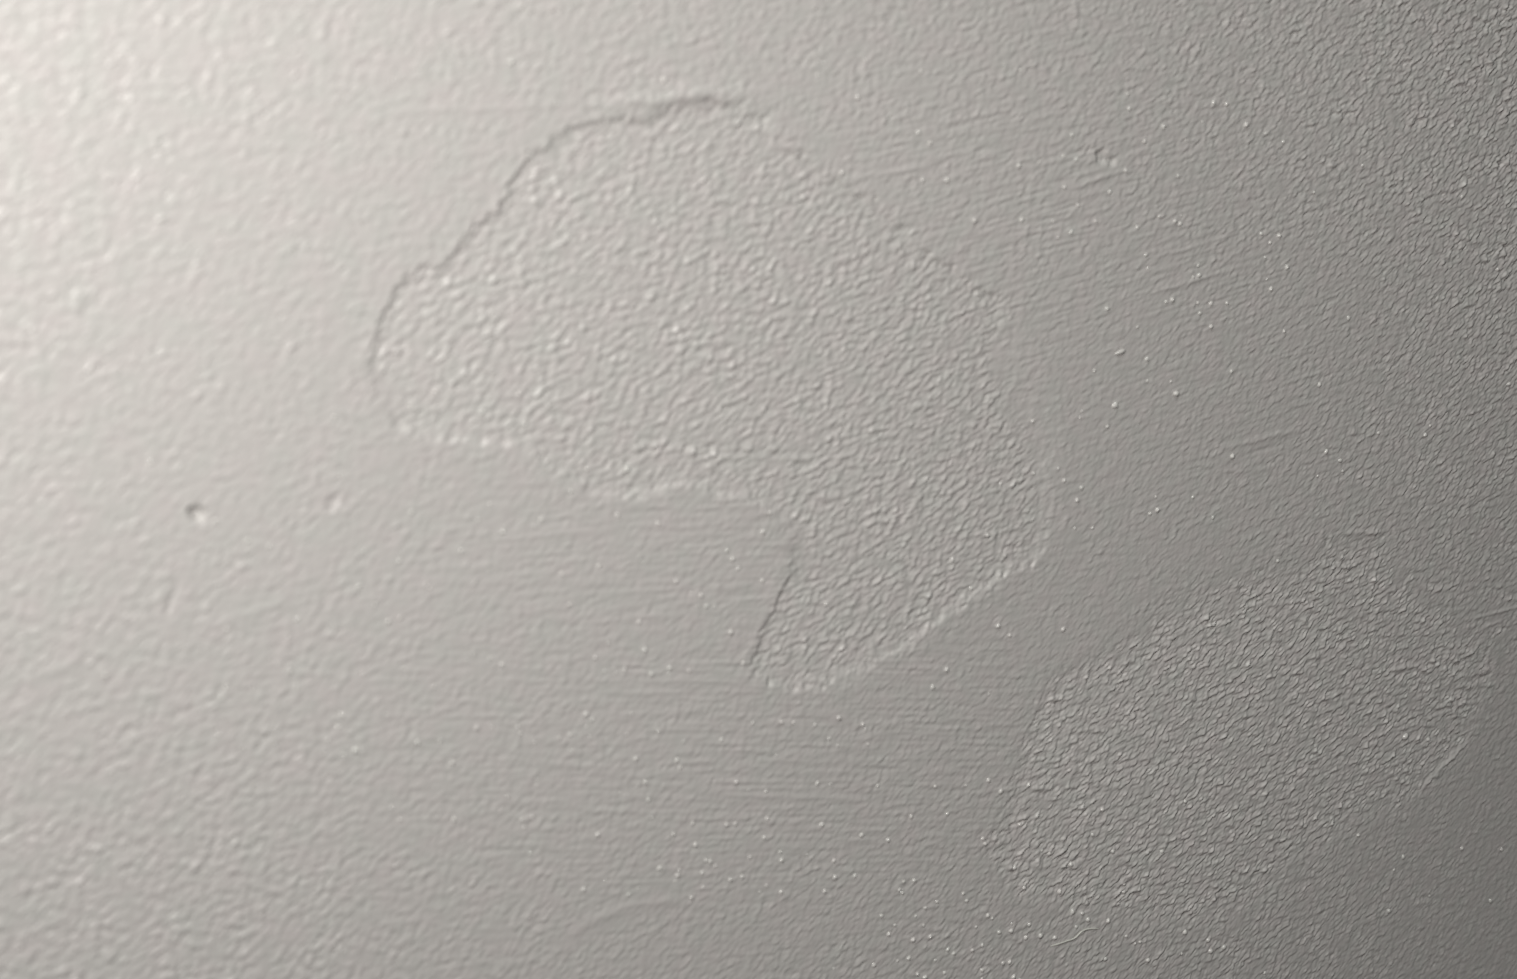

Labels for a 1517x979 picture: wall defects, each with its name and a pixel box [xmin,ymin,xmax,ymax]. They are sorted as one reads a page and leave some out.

peeling [357,89,1083,702]